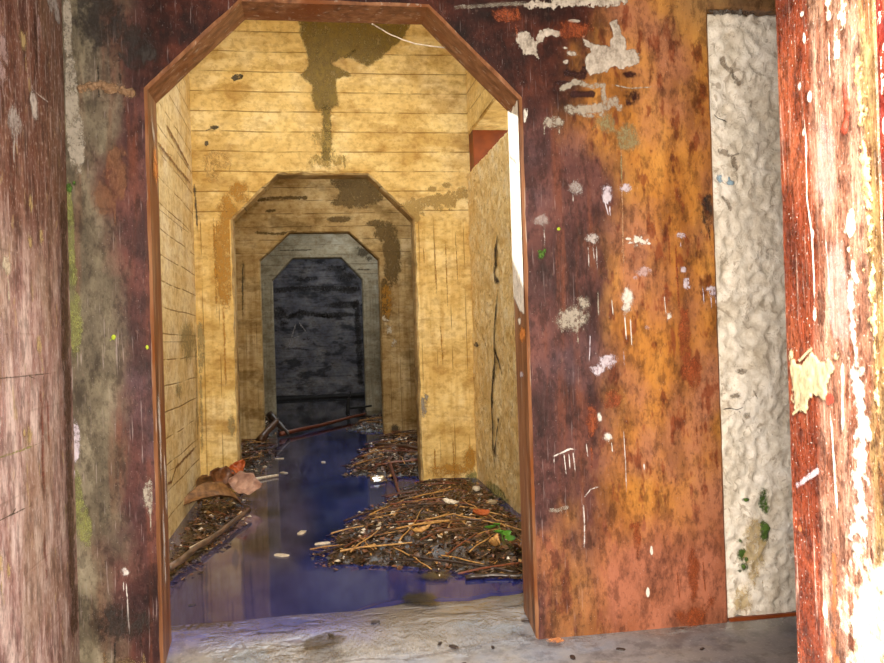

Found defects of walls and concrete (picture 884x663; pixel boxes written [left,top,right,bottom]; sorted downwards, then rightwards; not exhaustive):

leakage [299,21,410,167]
rust [494,9,519,35]
peeling [516,28,560,59]
rust [555,66,595,98]
peeling [524,0,628,10]
peeling [563,20,639,76]
leakage [213,183,307,379]
leakage [273,247,372,385]
leakage [367,220,401,314]
crack [491,239,502,463]
rust [668,234,702,386]
peeling [789,347,839,415]